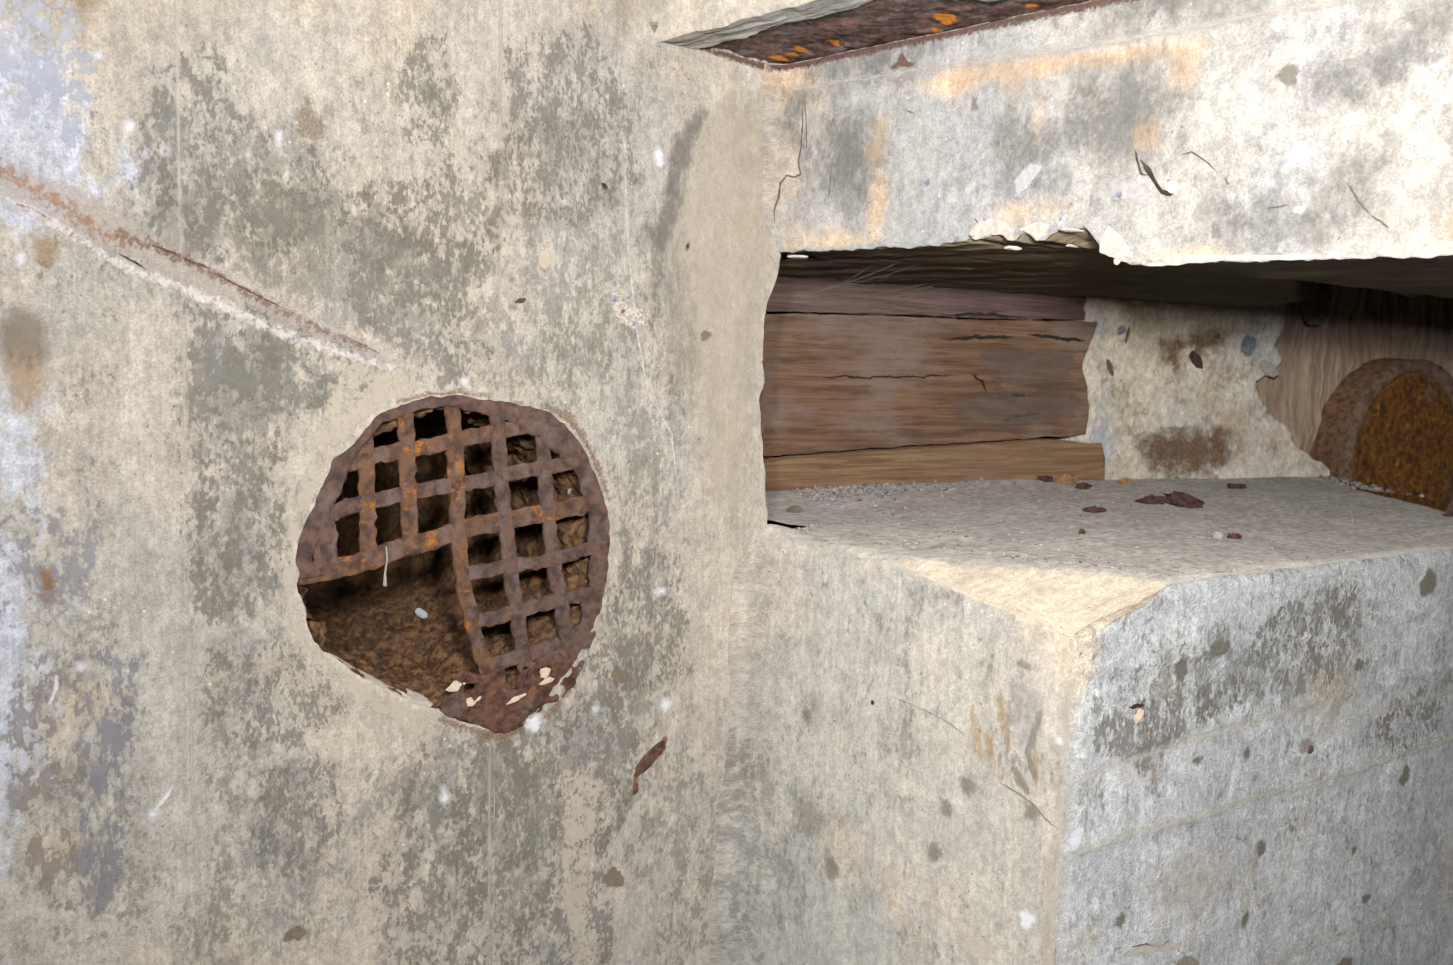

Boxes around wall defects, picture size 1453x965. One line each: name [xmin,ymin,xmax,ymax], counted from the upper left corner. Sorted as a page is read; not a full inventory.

corrosion [700,0,1135,71]
crack [773,96,831,222]
crack [0,164,402,373]
peeling [969,214,1067,241]
peeling [1099,226,1316,267]
water stain [1,315,41,361]
corrosion [545,407,607,491]
corrosion [440,630,596,743]
corrosion [632,737,667,795]